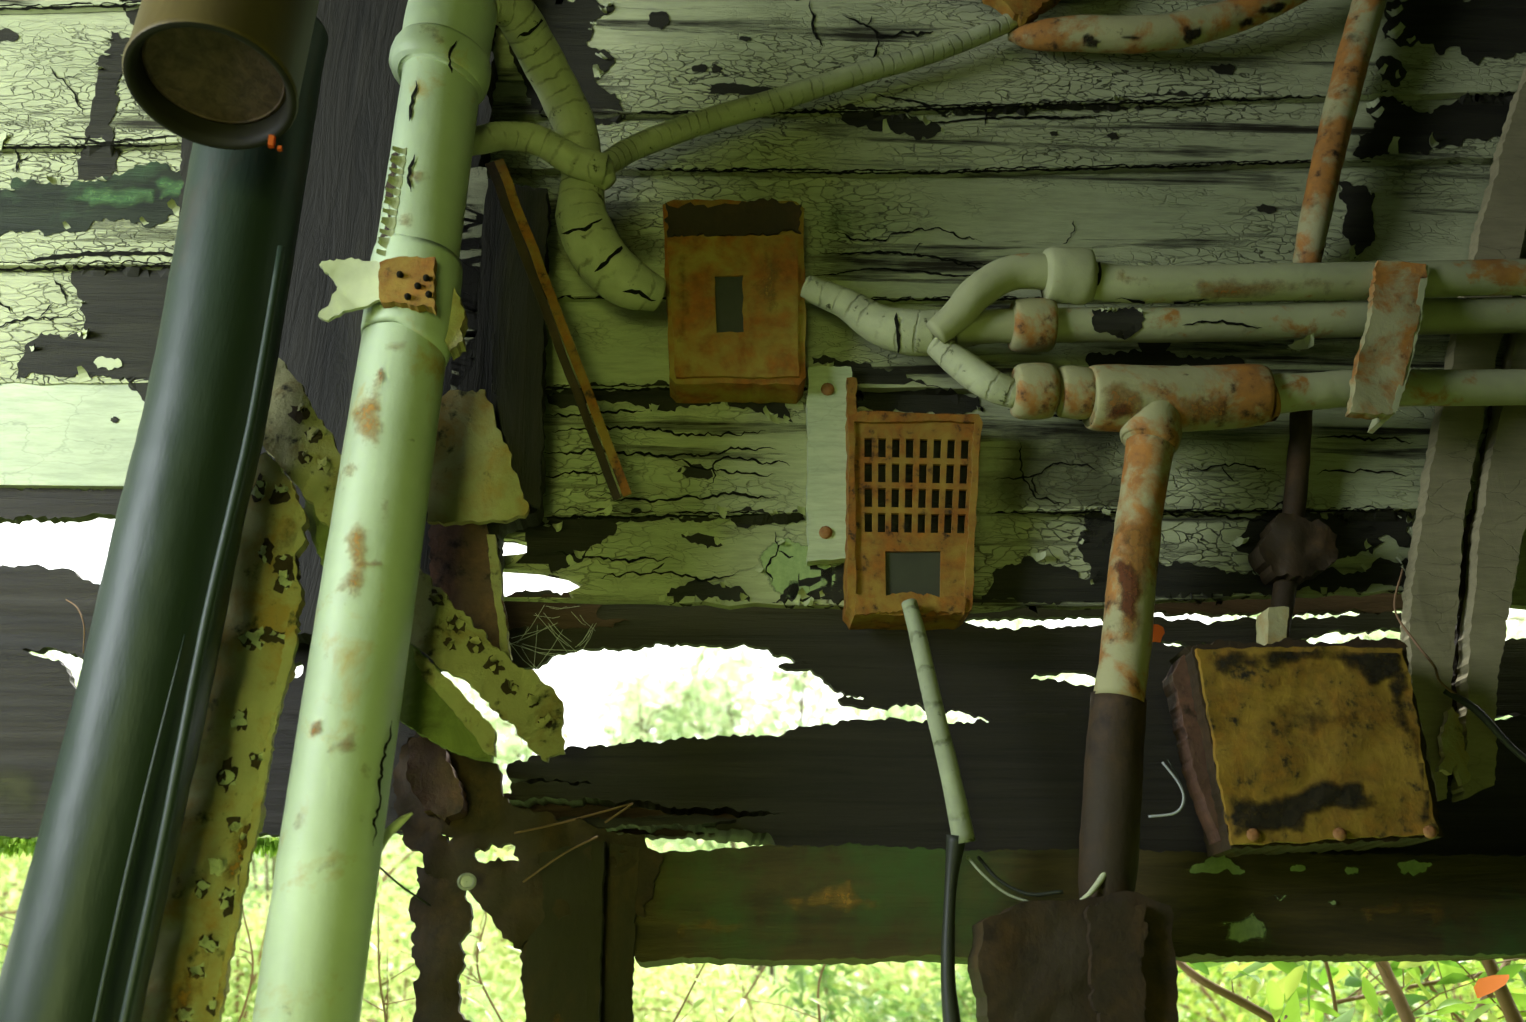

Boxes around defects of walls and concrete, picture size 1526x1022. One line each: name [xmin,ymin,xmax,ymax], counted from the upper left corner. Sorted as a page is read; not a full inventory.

peeling [0,0,183,237]
crack [2,68,181,173]
peeling [532,0,626,125]
peeling [1353,0,1526,163]
crack [0,250,173,327]
corrosion [846,377,857,418]
crack [543,384,794,582]
corrosion [348,528,363,586]
corrosion [1116,528,1152,638]
mould [1215,648,1319,673]
mould [1337,652,1429,820]
water stain [1231,781,1369,834]